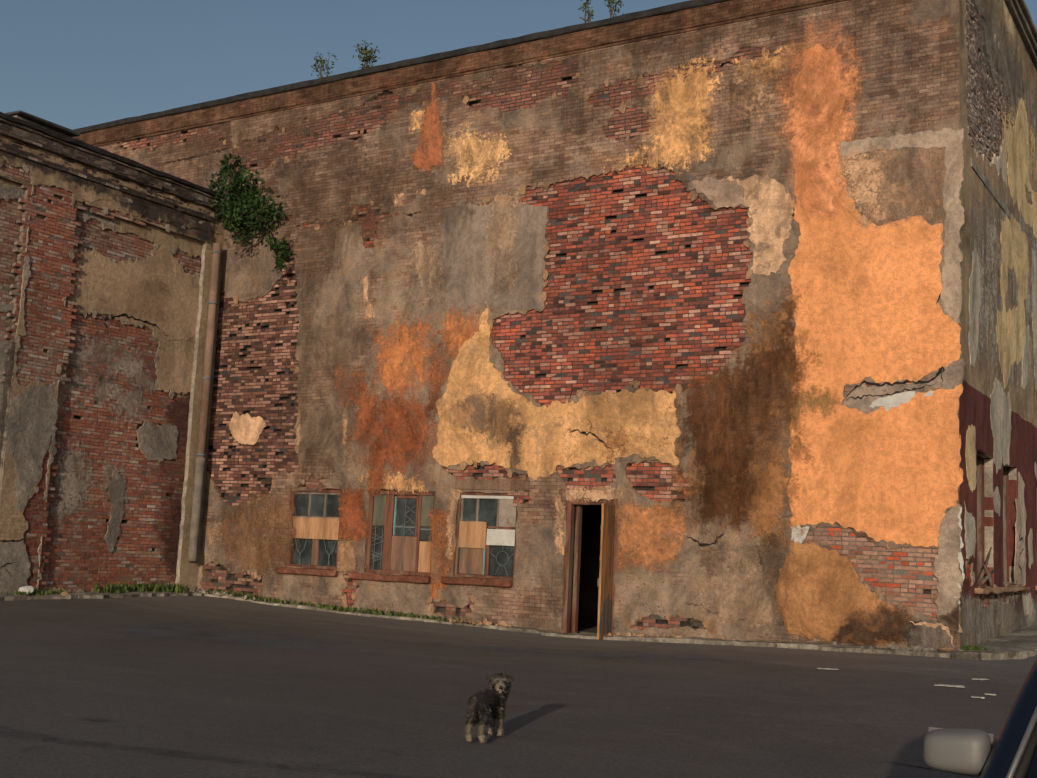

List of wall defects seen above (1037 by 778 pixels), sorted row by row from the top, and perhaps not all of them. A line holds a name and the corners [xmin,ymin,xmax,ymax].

spalling [0,154,206,592]
spalling [206,252,327,506]
crack [570,429,623,452]
spalling [479,164,753,407]
leakage [615,294,840,629]
peeling [787,0,1037,621]